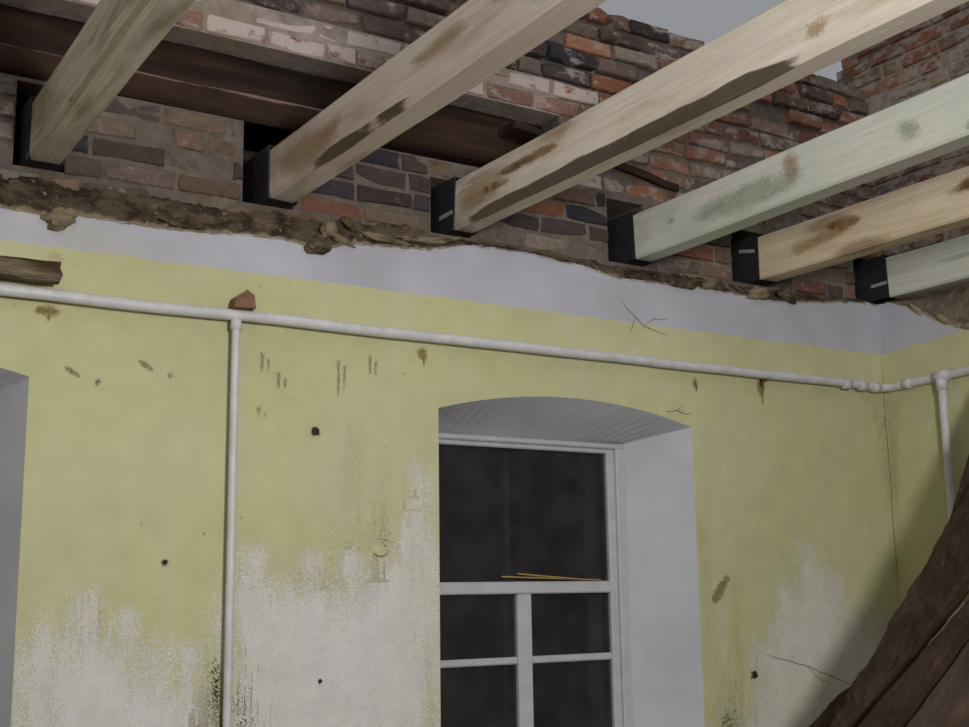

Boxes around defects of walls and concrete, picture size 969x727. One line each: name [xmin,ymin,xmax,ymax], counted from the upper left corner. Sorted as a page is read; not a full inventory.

spalling [0,174,878,306]